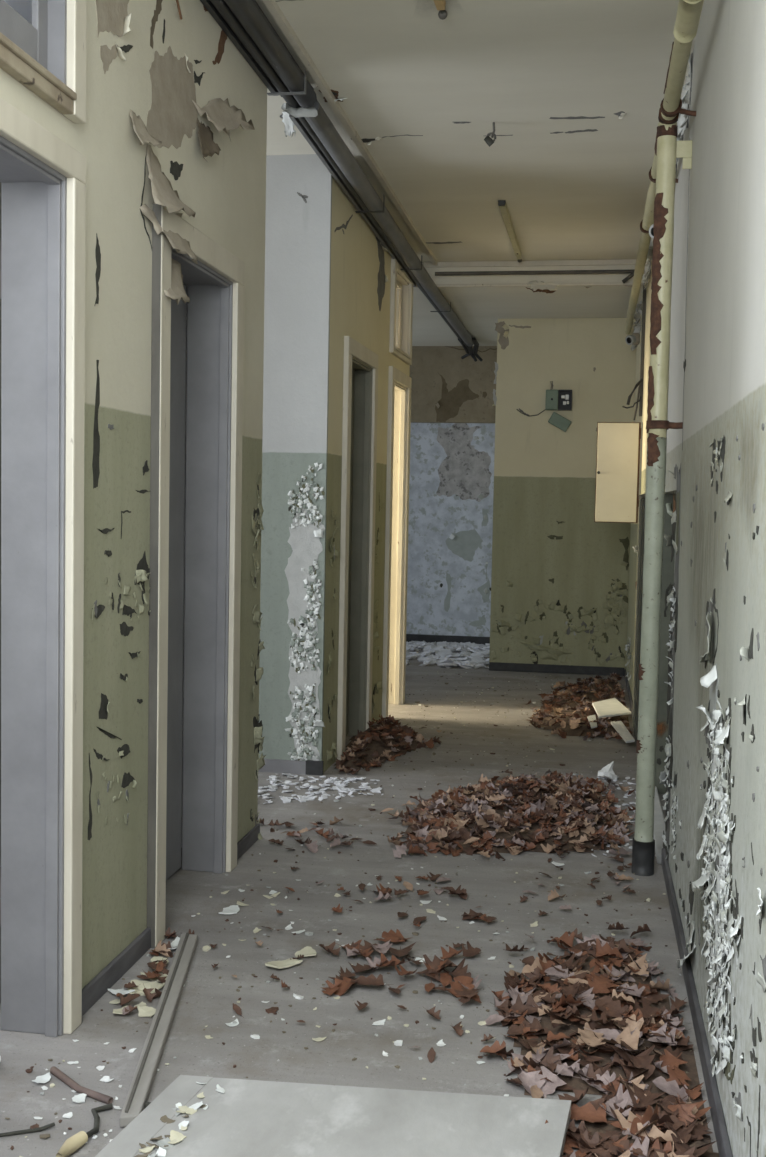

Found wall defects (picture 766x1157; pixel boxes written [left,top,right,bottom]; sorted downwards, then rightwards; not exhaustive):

peeling [657,436,766,1157]